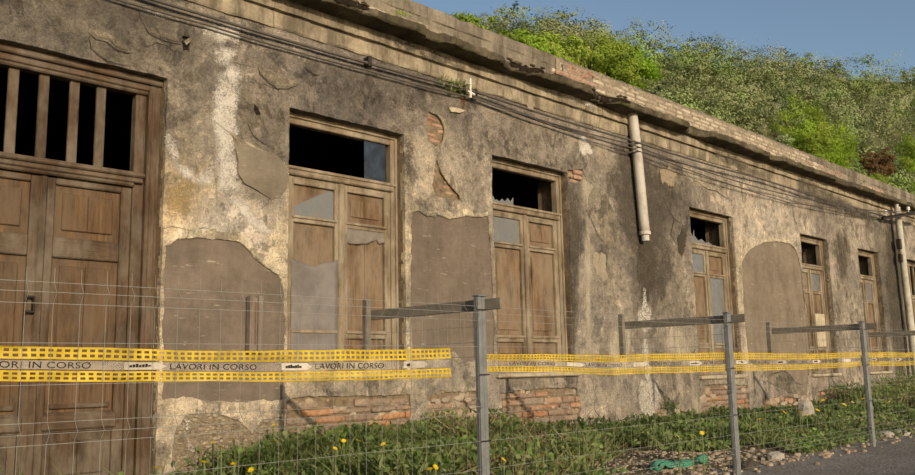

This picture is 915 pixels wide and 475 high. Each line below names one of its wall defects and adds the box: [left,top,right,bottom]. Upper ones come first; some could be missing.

crack [88,30,129,64]
spalling [426,107,465,147]
leakage [579,134,593,156]
flaking render [660,167,677,187]
spalling [506,57,848,183]
flaking render [158,228,411,475]
flaking render [410,159,492,364]
leakage [569,157,676,418]
flaking render [742,236,810,410]